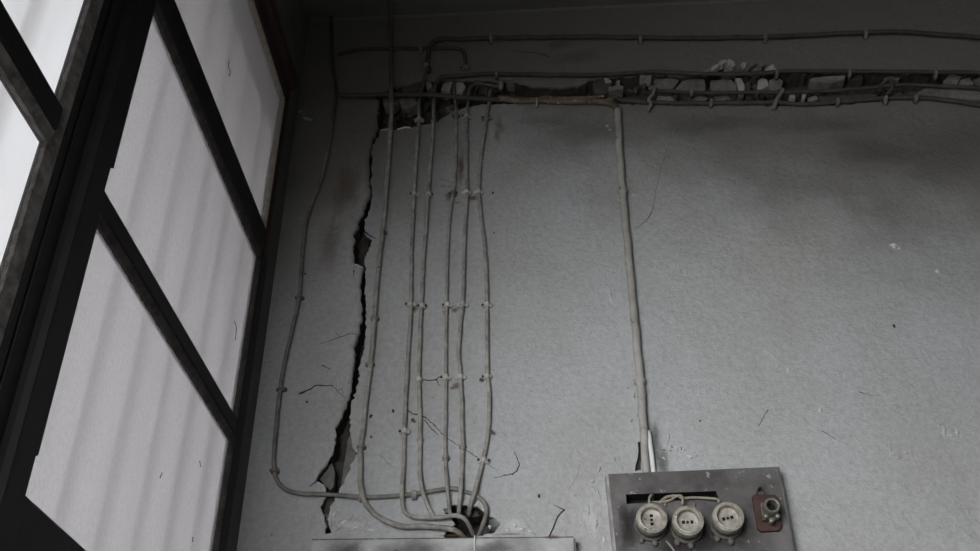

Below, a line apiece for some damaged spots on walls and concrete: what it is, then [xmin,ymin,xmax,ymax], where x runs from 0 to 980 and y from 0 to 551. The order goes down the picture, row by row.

flaking render [375,59,980,131]
crack [299,101,382,534]